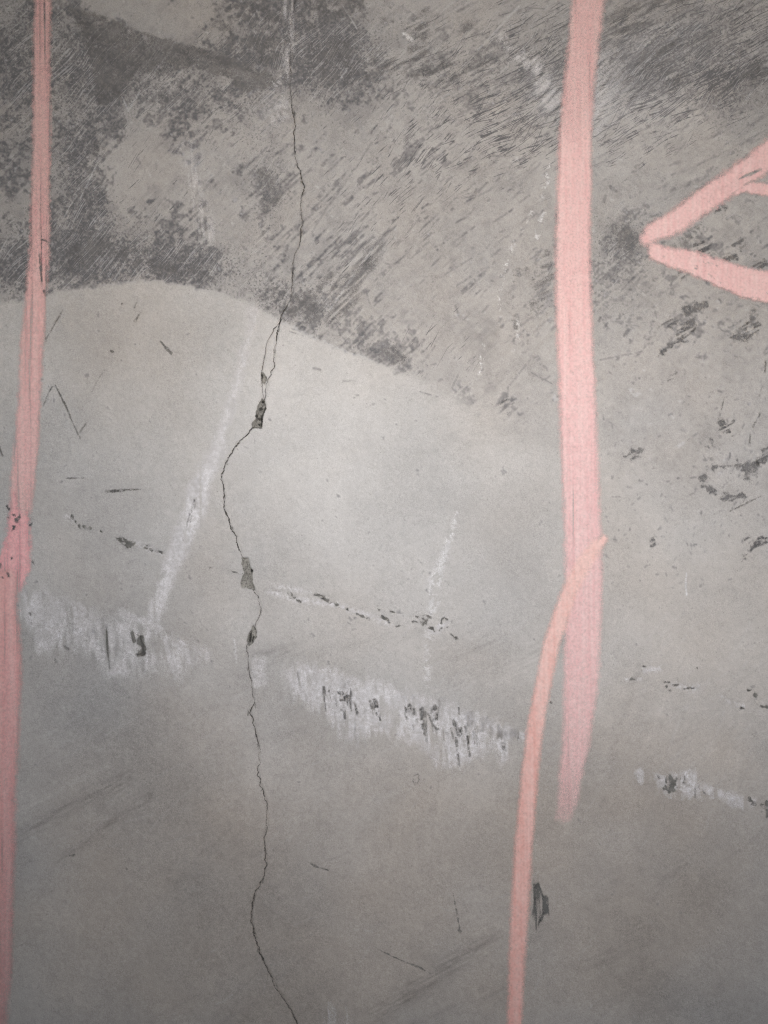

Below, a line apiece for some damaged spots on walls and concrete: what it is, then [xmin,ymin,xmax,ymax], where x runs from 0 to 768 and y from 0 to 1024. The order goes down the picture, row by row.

crack [220,1,305,1024]